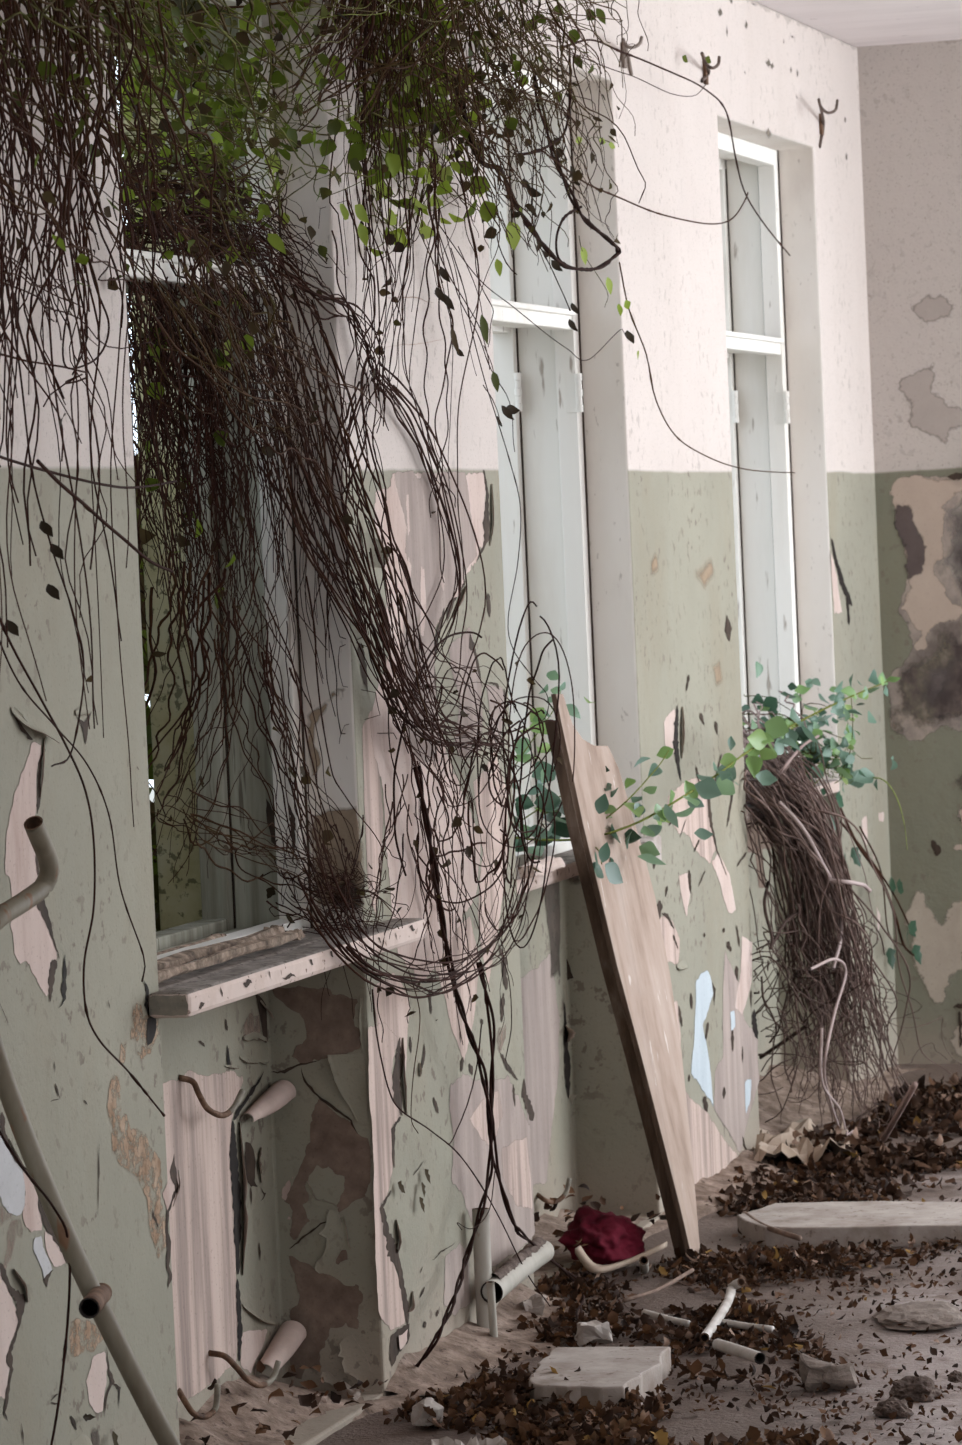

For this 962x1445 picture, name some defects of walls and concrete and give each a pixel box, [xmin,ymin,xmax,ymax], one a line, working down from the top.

water stain [888,475,962,741]
peeling [889,475,962,651]
crack [948,472,962,480]
peeling [5,707,60,897]
peeling [10,900,67,1006]
spalling [148,995,204,1016]
peeling [163,470,580,1402]
peeling [657,675,771,1184]
peeling [905,891,962,1057]
water stain [931,840,962,856]
peeling [0,1112,67,1444]